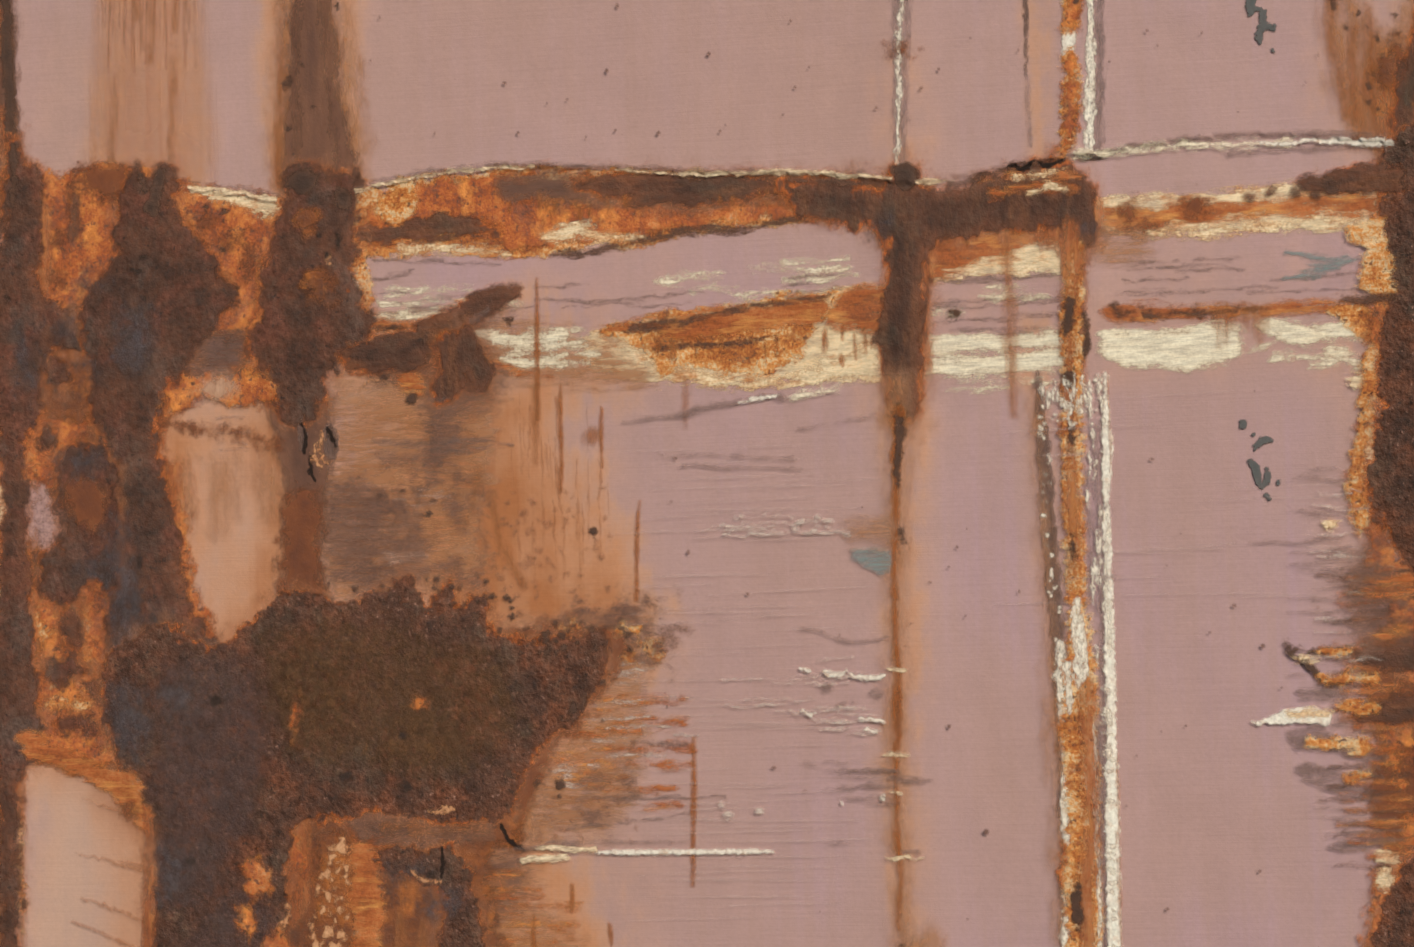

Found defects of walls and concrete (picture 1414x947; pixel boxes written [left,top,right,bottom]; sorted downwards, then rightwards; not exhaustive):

corrosion [0,0,23,240]
corrosion [171,0,887,379]
corrosion [1054,0,1083,159]
corrosion [1330,0,1414,153]
corrosion [21,346,696,947]
corrosion [581,285,939,947]